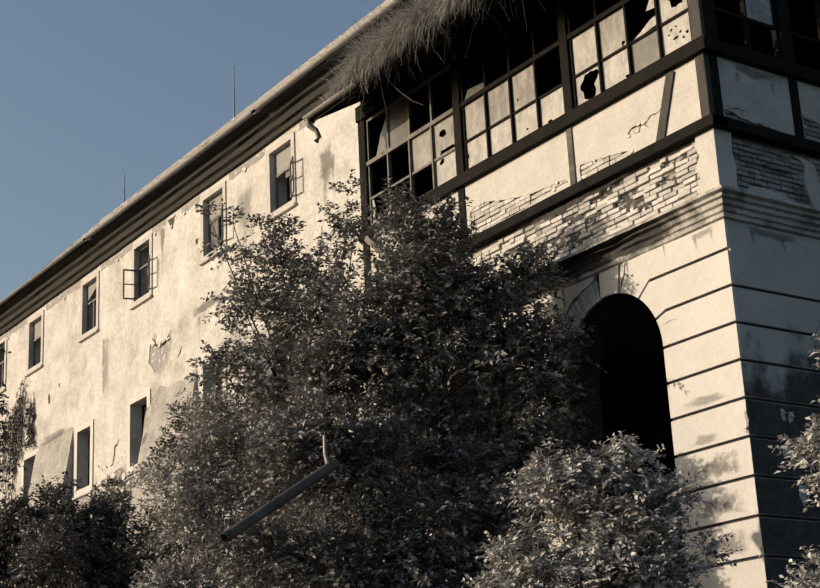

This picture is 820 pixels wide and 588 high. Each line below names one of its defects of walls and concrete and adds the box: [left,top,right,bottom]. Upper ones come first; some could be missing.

flaking render [802,116,820,142]
flaking render [579,149,634,181]
spalling [661,153,687,186]
flaking render [470,180,568,235]
spalling [542,178,654,251]
water stain [699,457,736,479]
water stain [704,495,735,517]